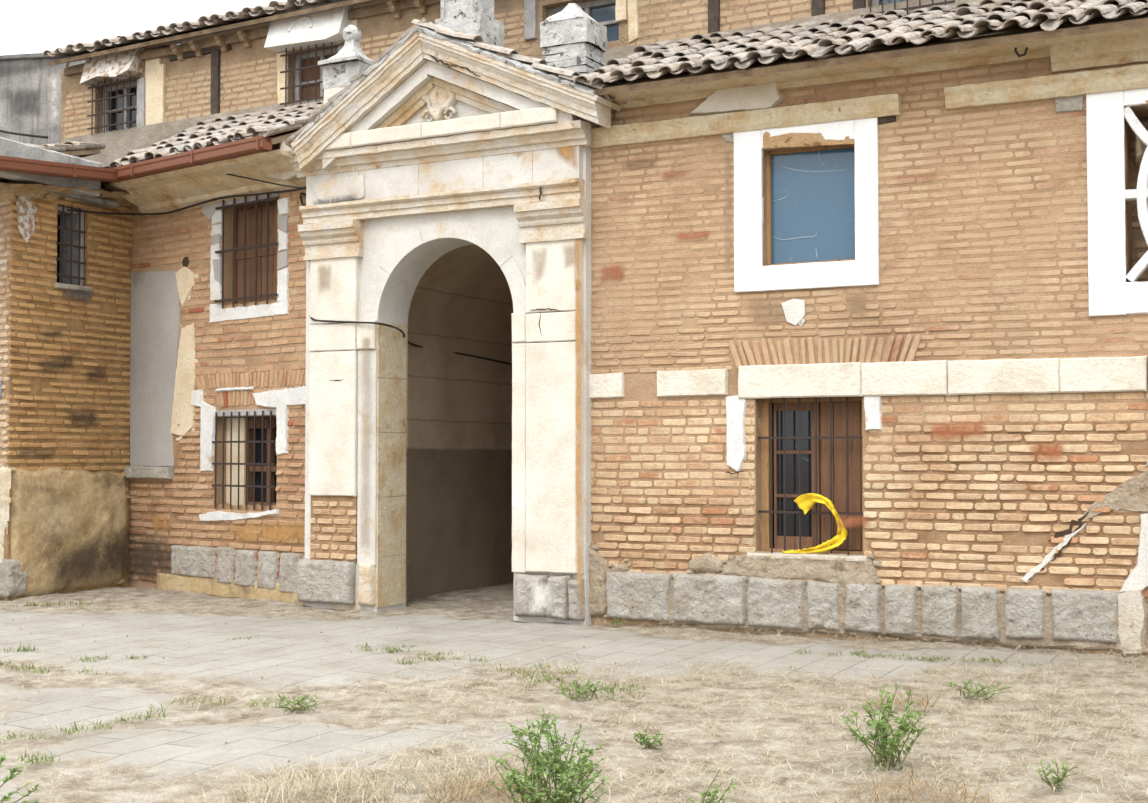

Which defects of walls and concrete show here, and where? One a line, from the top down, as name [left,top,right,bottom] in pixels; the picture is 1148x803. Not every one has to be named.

damp [36,501,76,536]
damp [58,488,172,579]